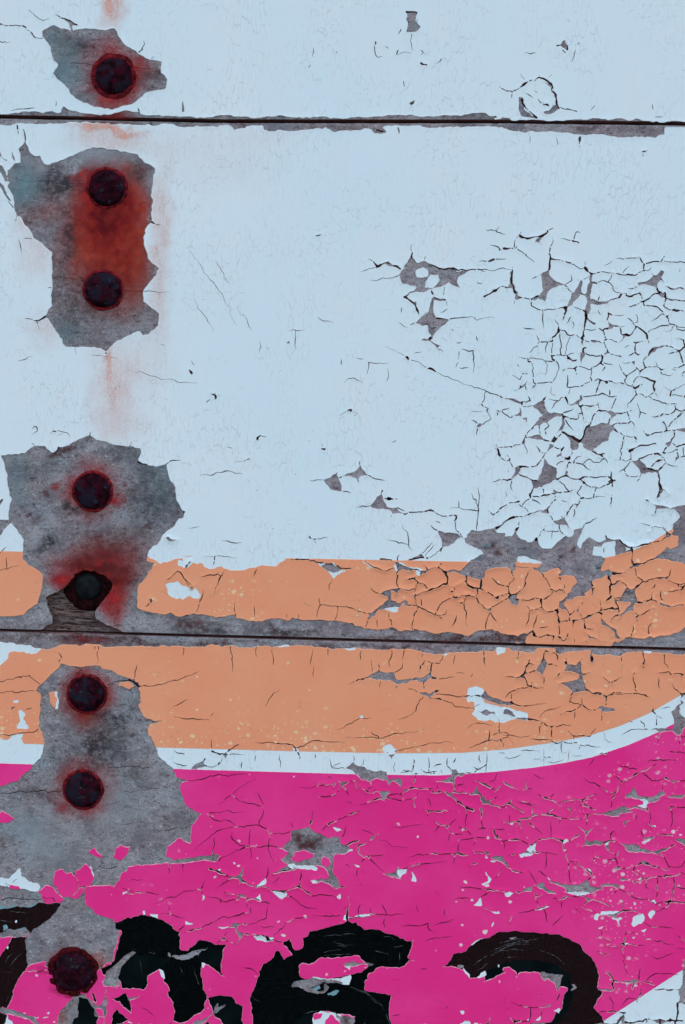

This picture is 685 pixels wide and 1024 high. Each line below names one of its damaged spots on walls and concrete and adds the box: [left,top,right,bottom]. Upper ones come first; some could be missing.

corrosion [83,49,142,139]
peeling [0,10,685,351]
corrosion [72,167,147,311]
peeling [361,250,485,372]
corrosion [52,543,127,615]
crack [147,527,288,616]
crack [173,227,685,1024]
peeling [0,426,685,980]
crack [0,743,44,765]
corrosion [47,947,99,997]
peeling [299,955,368,989]
peeling [312,1011,341,1024]